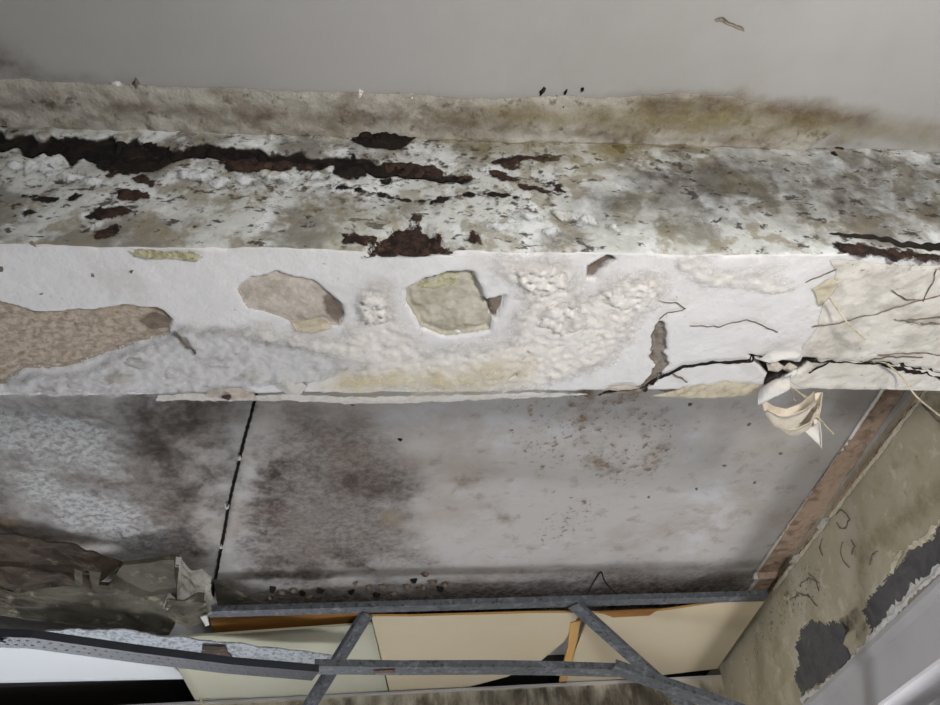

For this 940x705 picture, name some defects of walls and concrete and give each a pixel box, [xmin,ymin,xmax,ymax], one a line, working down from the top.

flaking render [0,301,172,383]
flaking render [237,270,344,333]
flaking render [406,270,502,335]
crack [598,300,779,397]
crack [804,352,940,379]
crack [806,232,940,327]
leakage [0,402,228,555]
crack [212,393,258,597]
leakage [252,425,403,581]
leakage [395,582,713,614]
peeling [793,519,940,704]
leakage [417,683,671,705]